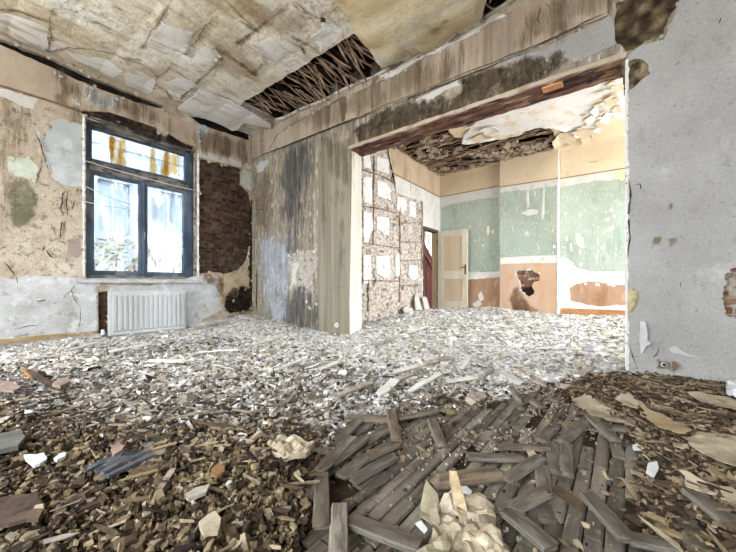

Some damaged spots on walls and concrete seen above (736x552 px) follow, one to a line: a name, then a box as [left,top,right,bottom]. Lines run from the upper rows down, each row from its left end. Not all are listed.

crack [0,1,337,101]
water stain [354,51,565,142]
flaking render [348,0,679,150]
rust [109,136,126,166]
rust [150,149,180,176]
flaking render [0,7,508,339]
water stain [11,181,37,225]
water stain [258,139,318,328]
crack [37,284,82,325]
flaking render [515,268,540,297]
flaking render [721,268,736,319]